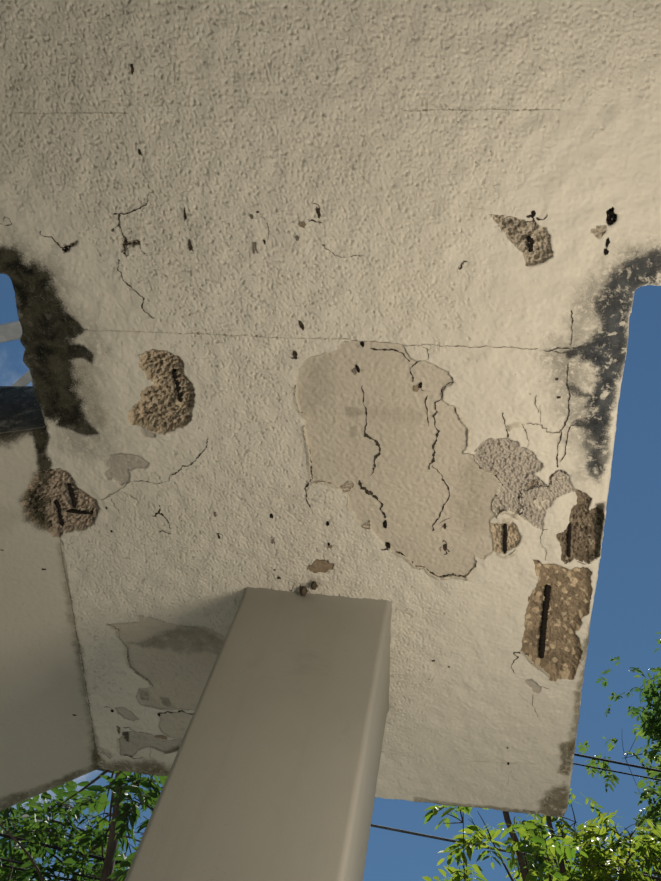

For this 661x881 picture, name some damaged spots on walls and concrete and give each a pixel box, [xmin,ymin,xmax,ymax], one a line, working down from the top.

mould [0,247,99,473]
spalling [21,468,100,537]
peeling [104,454,150,485]
crack [112,192,153,236]
crack [117,260,154,319]
spalling [127,349,195,438]
crack [341,385,390,551]
peeling [292,341,605,716]
crack [370,310,580,531]
spalling [491,211,553,266]
water stain [566,250,661,477]
peeling [104,615,225,759]